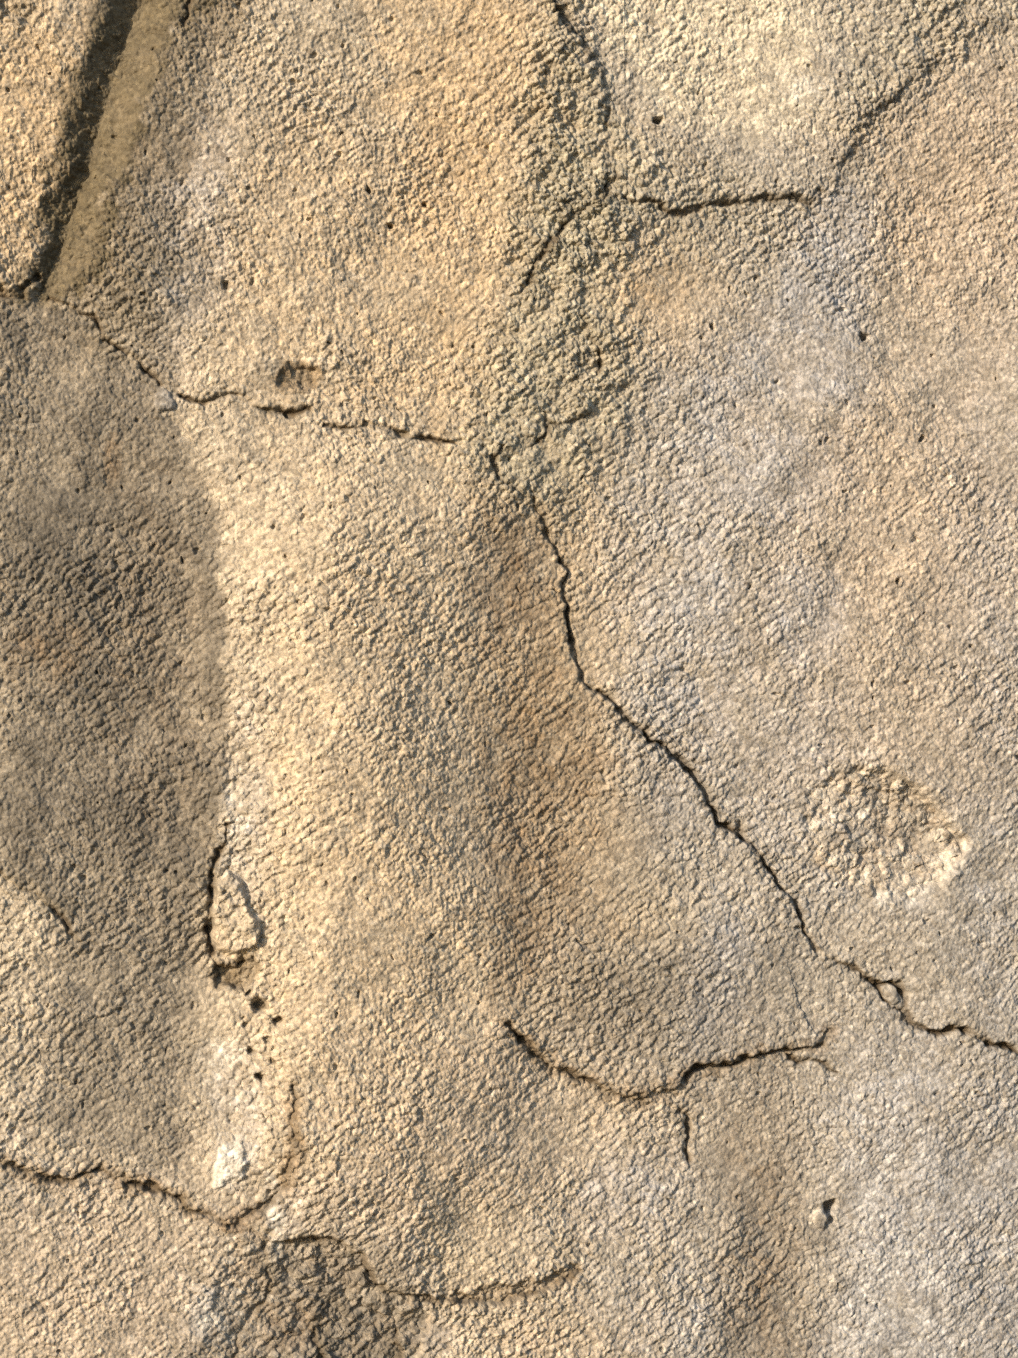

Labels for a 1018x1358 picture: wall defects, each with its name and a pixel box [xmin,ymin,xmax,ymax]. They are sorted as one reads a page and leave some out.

crack [509,0,955,309]
water stain [0,0,275,1209]
crack [0,263,1018,1077]
spalling [794,760,975,916]
crack [0,1076,311,1237]
water stain [175,1275,256,1358]
water stain [264,1205,289,1262]
spalling [212,1234,438,1358]
crack [496,1009,849,1174]